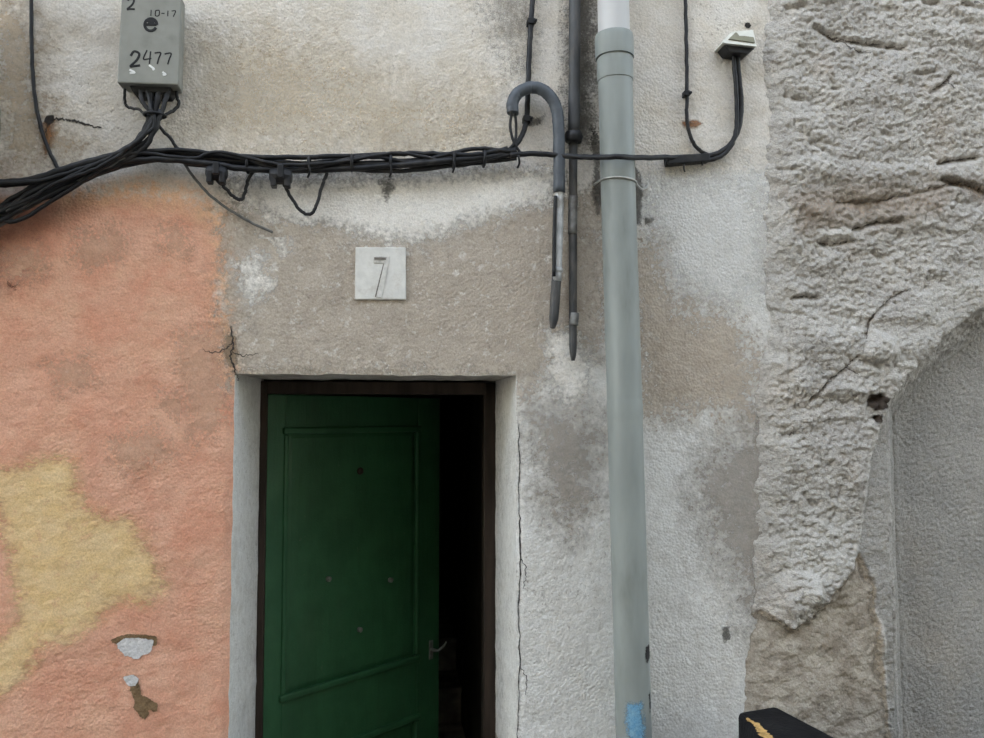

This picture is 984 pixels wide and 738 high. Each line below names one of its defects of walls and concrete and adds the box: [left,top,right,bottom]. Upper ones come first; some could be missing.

crack [203,326,257,381]
peeling [0,455,165,695]
flaking render [123,675,158,719]
crack [517,425,527,738]
peeling [744,562,888,738]